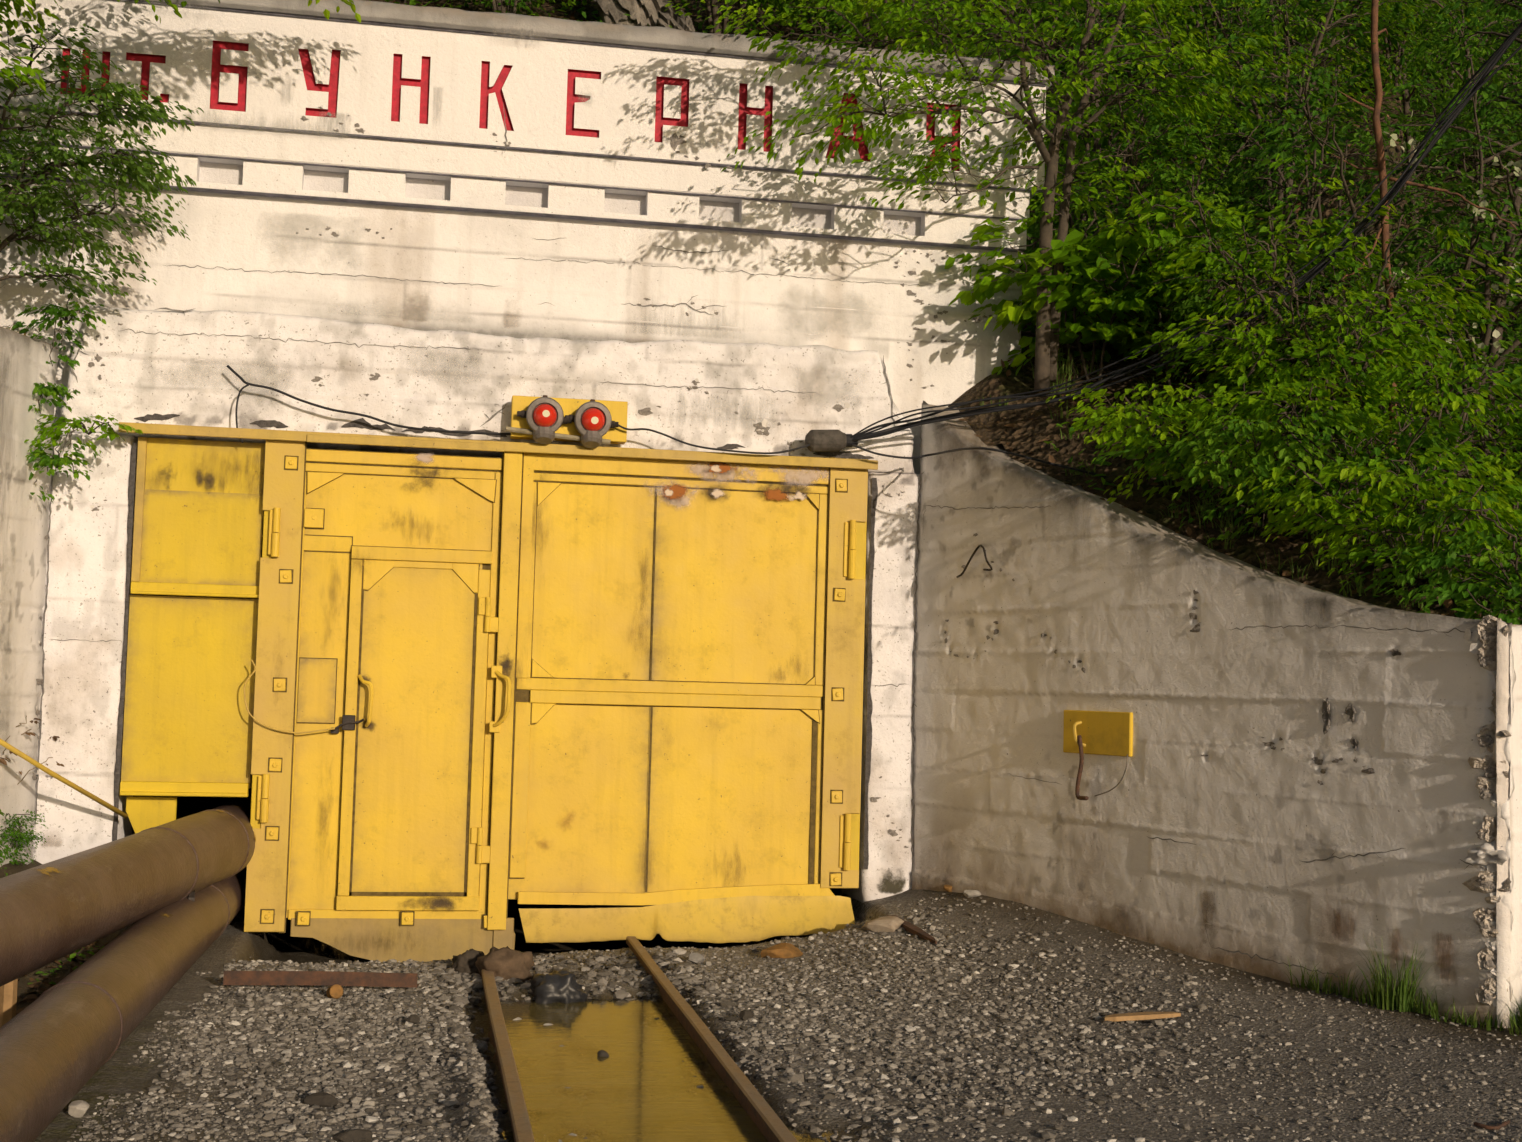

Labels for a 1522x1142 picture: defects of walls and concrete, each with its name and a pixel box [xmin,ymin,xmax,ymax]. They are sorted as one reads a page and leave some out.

spalling [717,418,873,460]
spalling [863,478,908,869]
peeling [1312,698,1375,785]
spalling [1462,615,1511,1007]